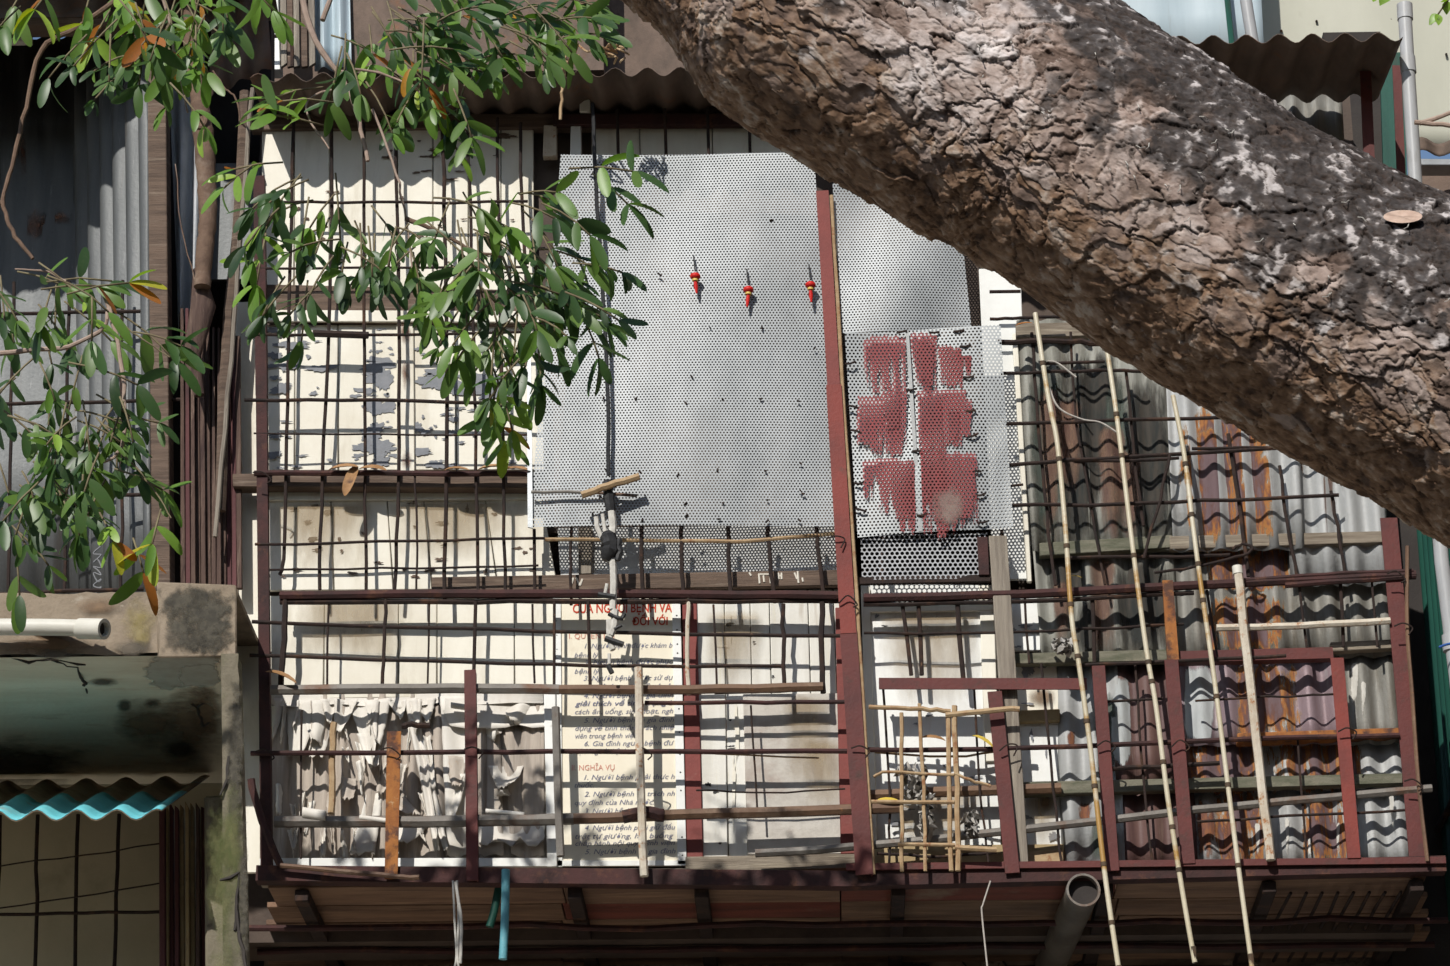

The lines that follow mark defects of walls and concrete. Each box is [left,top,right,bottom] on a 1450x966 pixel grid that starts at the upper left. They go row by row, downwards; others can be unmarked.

peeling [268,420,308,469]
peeling [267,324,340,403]
peeling [349,328,397,469]
peeling [414,347,510,469]
crack [0,654,88,694]
leakage [162,587,232,653]
rust [1180,407,1362,859]
leakage [0,747,74,783]
leakage [119,683,249,965]
peeling [271,693,545,859]